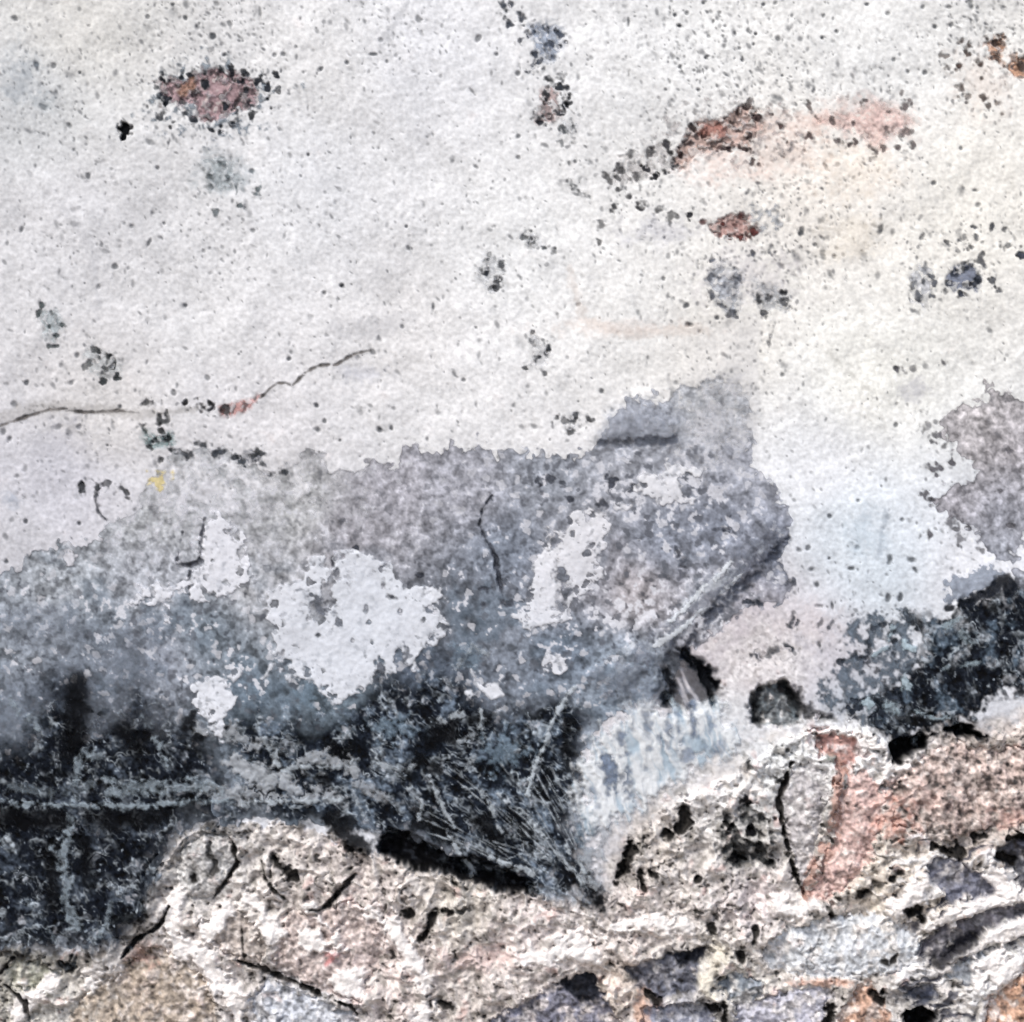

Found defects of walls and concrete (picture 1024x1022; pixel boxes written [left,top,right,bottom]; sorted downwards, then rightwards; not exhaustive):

peeling [0,380,796,849]
leakage [749,643,794,660]
leakage [816,564,1024,744]
spalling [888,723,989,765]
crack [214,842,286,900]
crack [309,873,356,912]
leakage [0,643,740,959]
spalling [325,789,538,895]
spalling [720,795,775,868]
crack [775,761,805,894]
crack [121,905,170,958]
spalling [901,1005,937,1022]